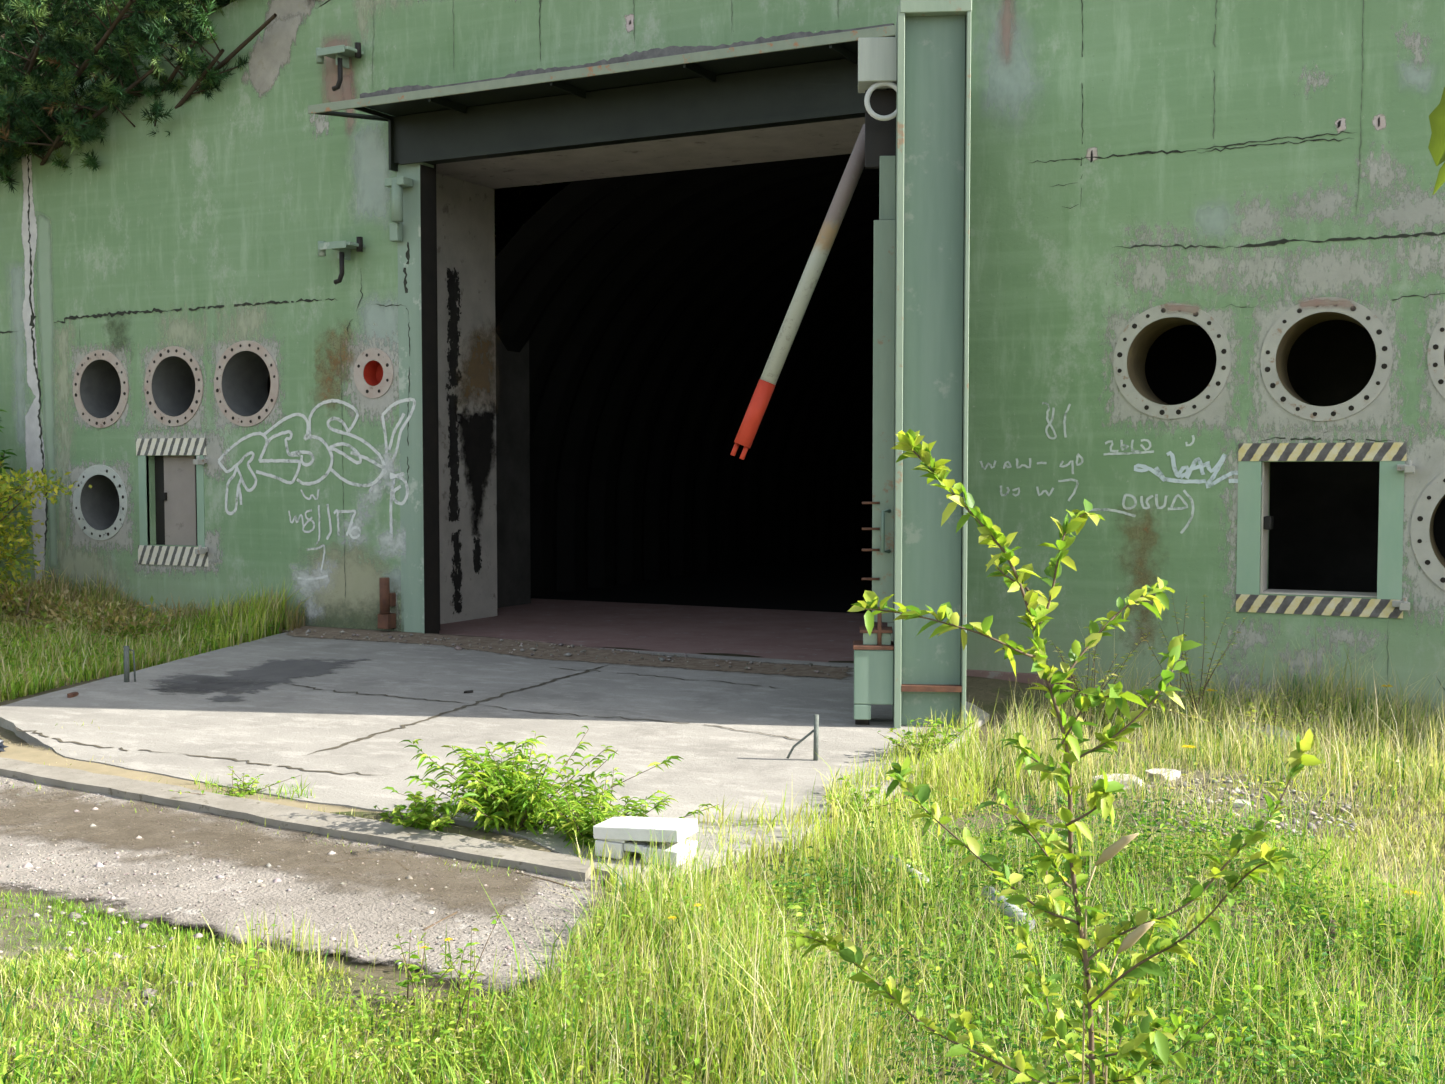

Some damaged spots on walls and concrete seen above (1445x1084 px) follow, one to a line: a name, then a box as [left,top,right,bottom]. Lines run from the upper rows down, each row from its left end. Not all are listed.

crack [1033,131,1356,209]
crack [1115,232,1445,249]
crack [0,154,410,560]
leakage [458,333,497,536]